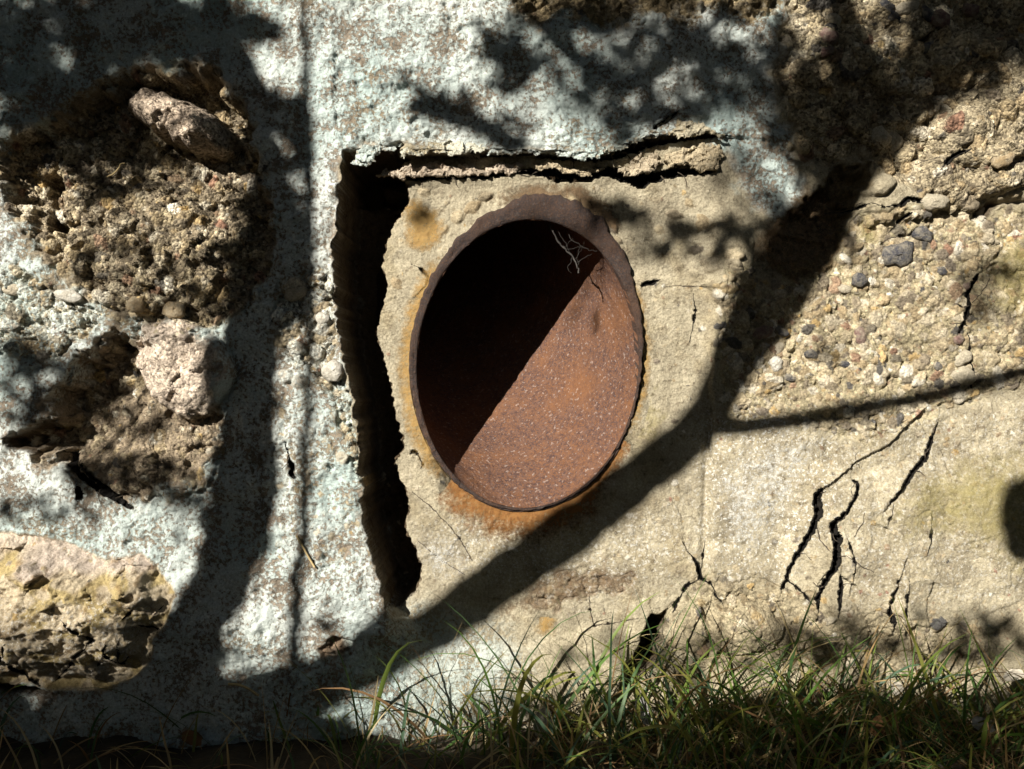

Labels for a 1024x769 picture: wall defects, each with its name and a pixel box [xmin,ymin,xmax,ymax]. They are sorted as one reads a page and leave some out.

peeling [350,115,725,181]
crack [397,110,732,193]
corrosion [407,200,439,250]
corrosion [499,185,620,231]
spalling [0,64,280,504]
corrosion [398,267,440,475]
corrosion [631,330,648,424]
crack [950,272,990,388]
corrosion [439,440,631,544]
crack [781,422,938,628]
spalling [529,570,635,612]
crack [672,541,723,613]